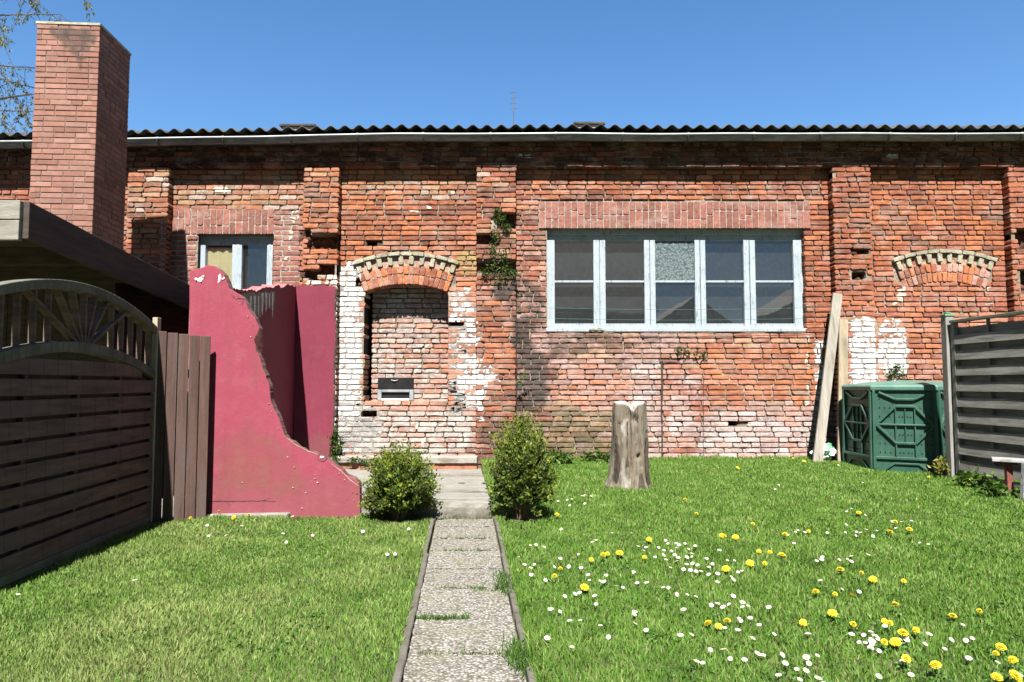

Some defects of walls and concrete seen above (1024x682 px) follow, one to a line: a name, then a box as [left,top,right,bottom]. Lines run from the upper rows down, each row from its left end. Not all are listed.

peeling [287,261,501,493]
peeling [848,317,910,384]